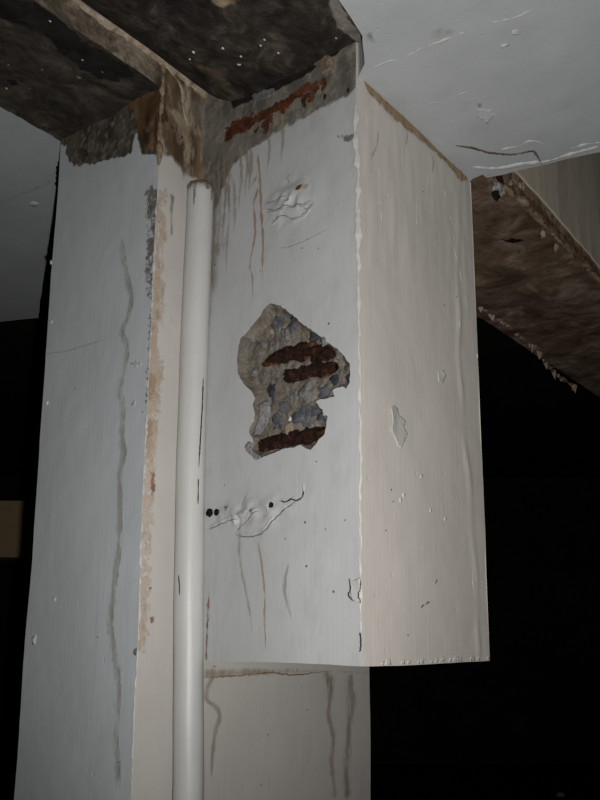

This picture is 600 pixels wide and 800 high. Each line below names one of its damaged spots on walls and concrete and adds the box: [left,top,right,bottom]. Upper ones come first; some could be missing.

damp [61,0,468,276]
corrosion [225,77,327,142]
crack [455,145,542,165]
peeling [133,186,174,656]
spalling [237,303,350,460]
peeling [391,405,408,449]